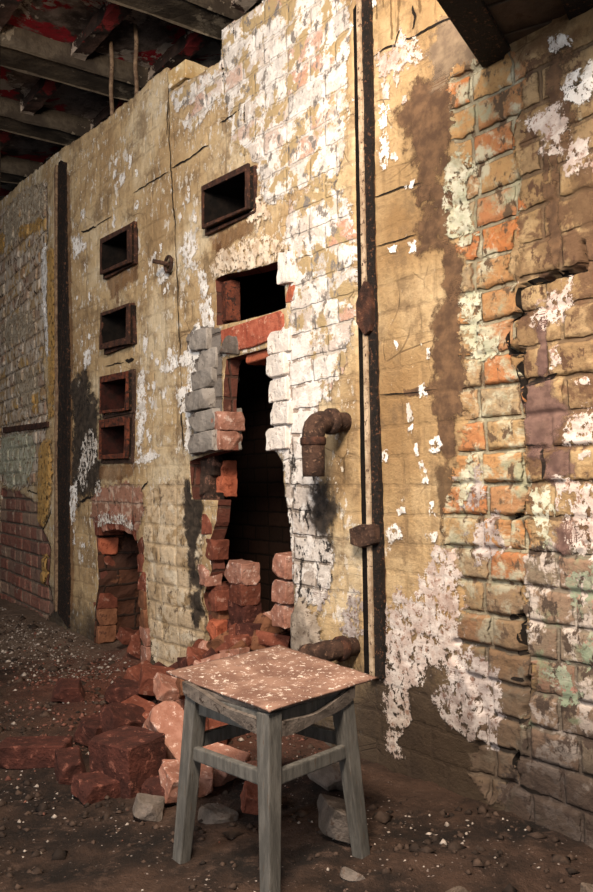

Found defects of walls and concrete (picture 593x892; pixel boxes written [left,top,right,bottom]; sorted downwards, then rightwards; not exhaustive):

spalling [0,180,54,620]
leakage [70,366,91,421]
peeling [112,154,138,228]
crack [135,84,208,447]
peeling [134,0,358,613]
peeling [339,589,364,639]
leakage [393,16,482,533]
spalling [374,27,593,849]
crack [505,253,588,479]